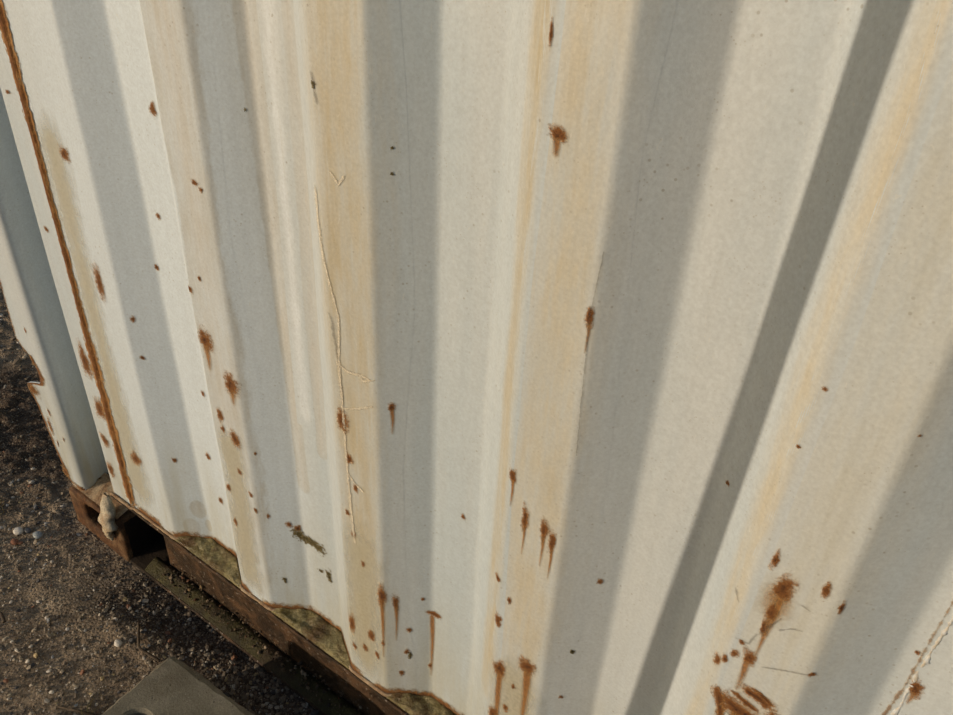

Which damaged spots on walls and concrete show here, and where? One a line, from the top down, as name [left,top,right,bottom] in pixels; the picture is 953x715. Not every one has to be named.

corrosion [549,125,566,155]
corrosion [0,0,252,594]
corrosion [585,307,594,349]
corrosion [520,503,529,547]
corrosion [540,520,556,572]
corrosion [263,584,412,676]
corrosion [421,598,441,668]
corrosion [713,550,798,684]